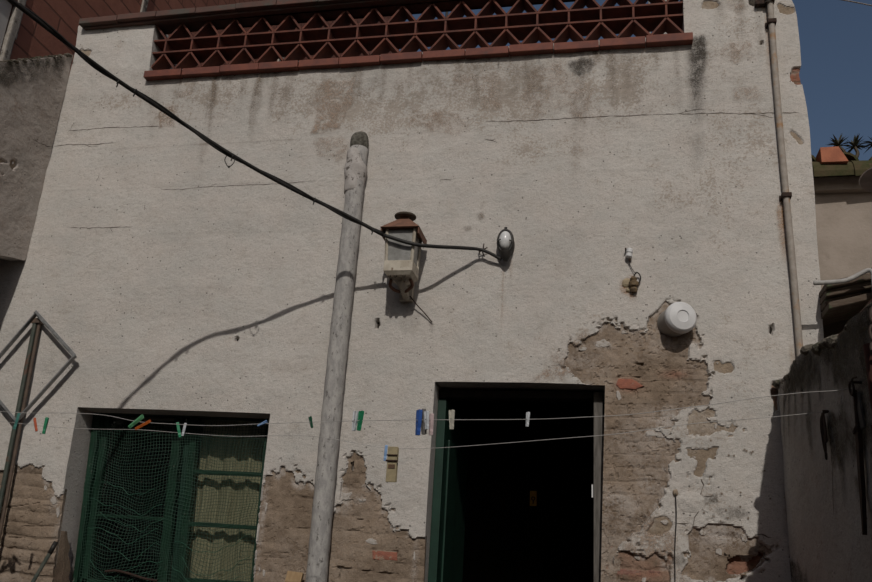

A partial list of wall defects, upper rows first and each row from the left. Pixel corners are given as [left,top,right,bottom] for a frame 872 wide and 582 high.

crack [33,126,157,147]
crack [506,115,607,123]
leakage [692,37,705,97]
crack [631,109,797,118]
flaking render [543,301,745,582]
leakage [783,303,872,465]
flaking render [0,465,71,582]
flaking render [254,467,314,582]
flaking render [327,451,427,582]
flaking render [682,509,772,582]